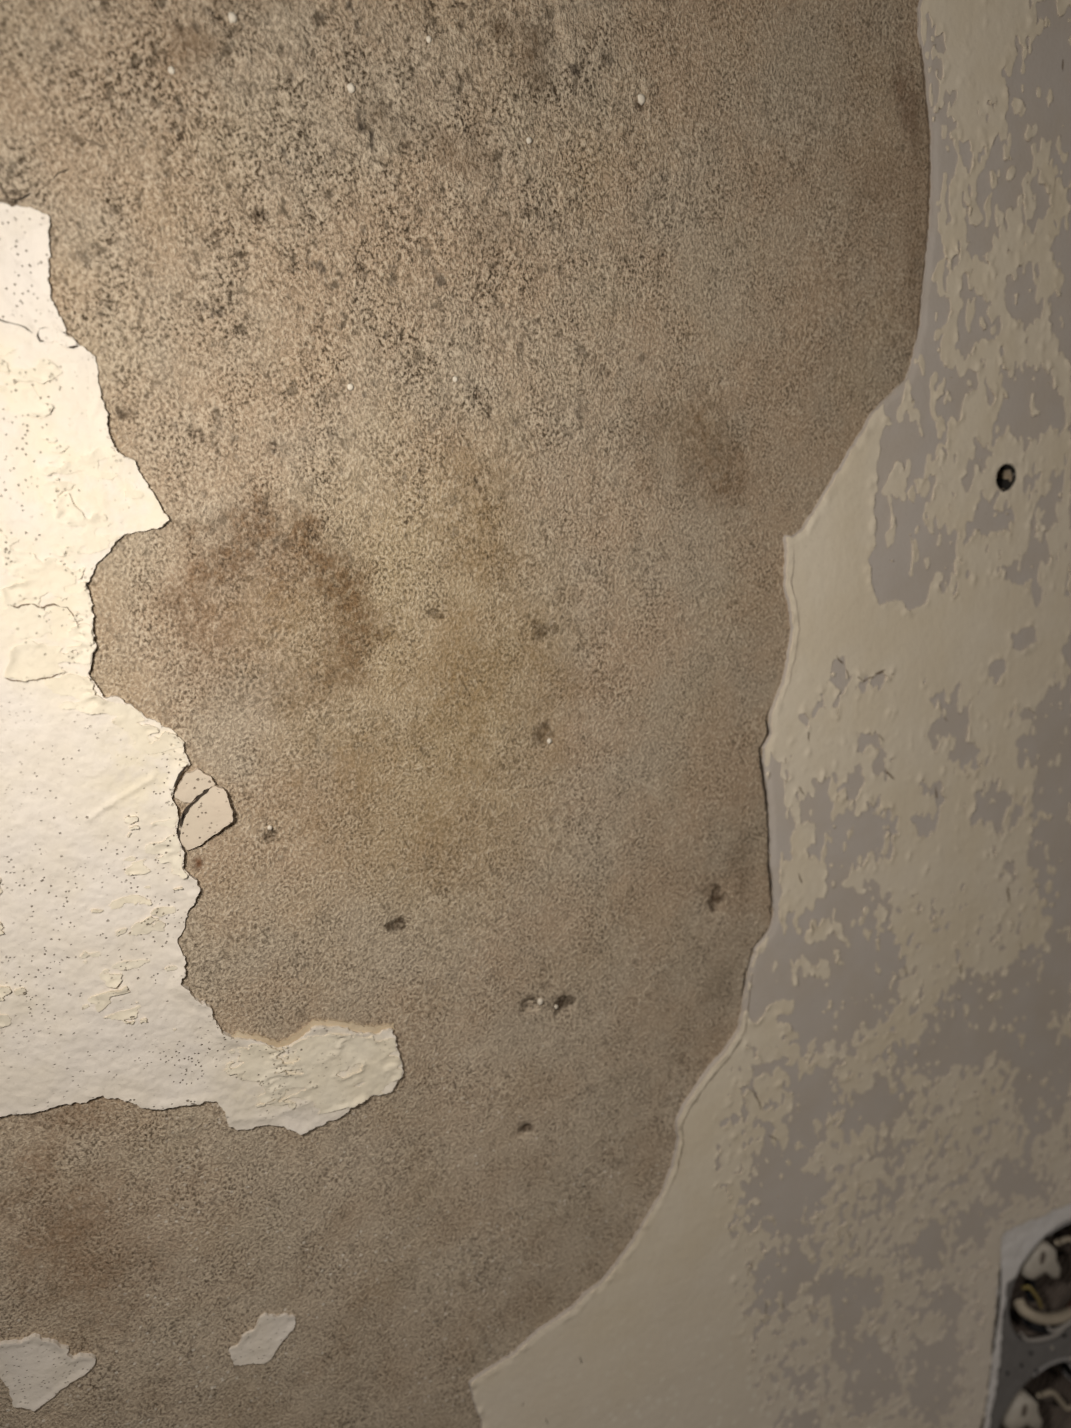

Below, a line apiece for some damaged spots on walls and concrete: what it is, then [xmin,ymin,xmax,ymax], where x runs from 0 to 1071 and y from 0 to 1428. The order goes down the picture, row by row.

peeling [0,190,405,1135]
peeling [469,0,1071,1428]
peeling [0,1333,96,1411]
peeling [228,1312,296,1366]